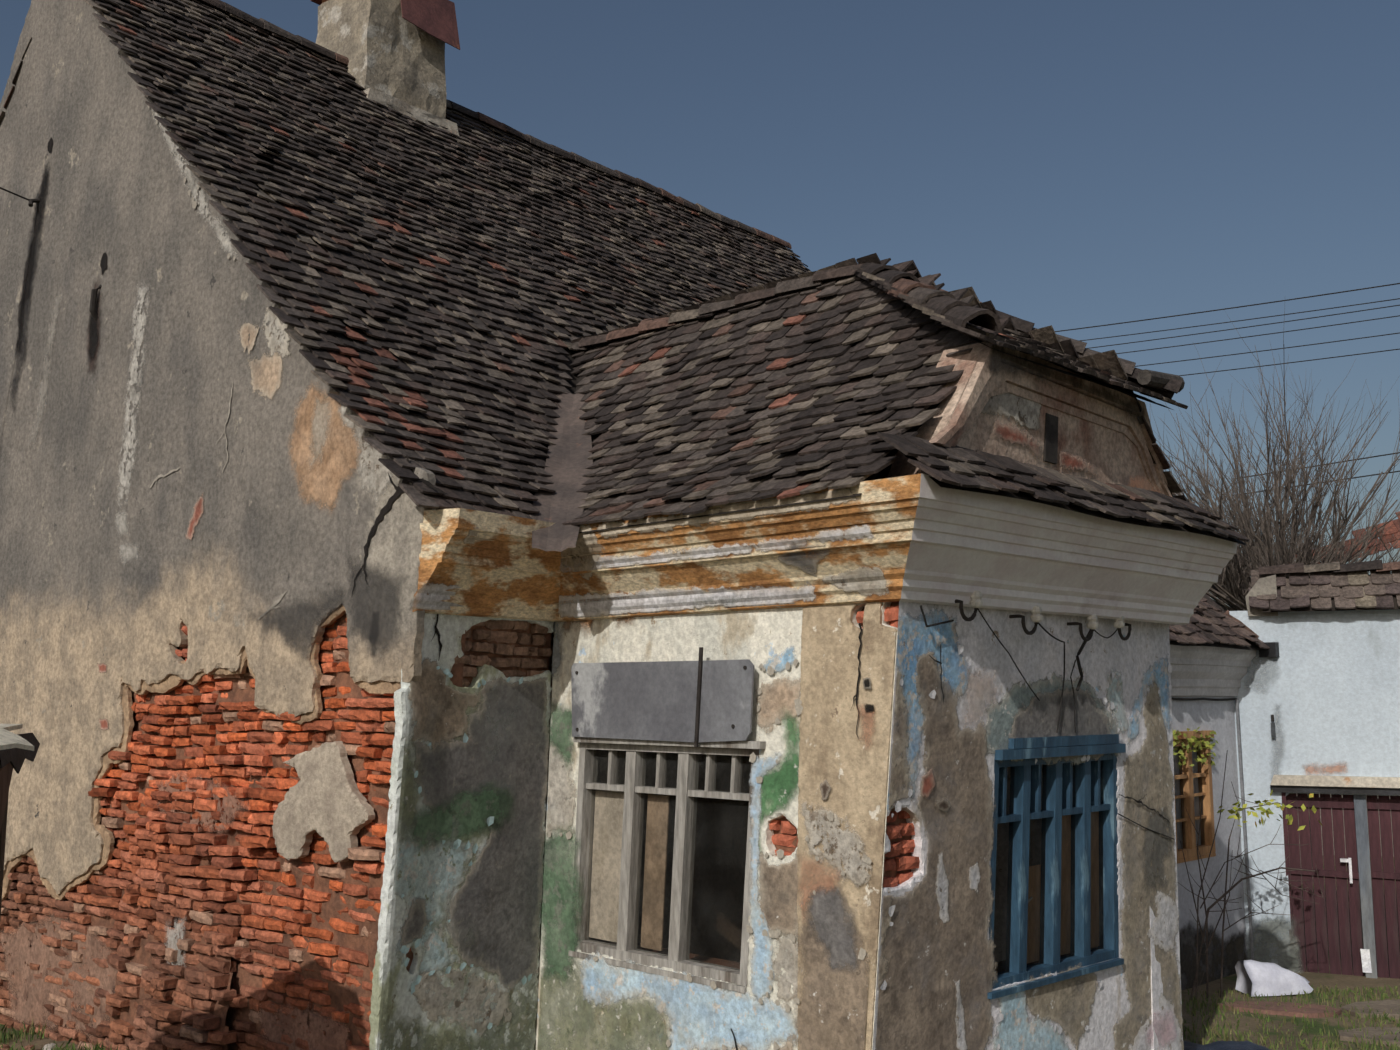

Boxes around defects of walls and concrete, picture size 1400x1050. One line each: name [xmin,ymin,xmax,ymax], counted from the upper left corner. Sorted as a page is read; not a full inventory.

leakage [11,167,48,397]
spalling [239,307,290,400]
spalling [186,494,204,540]
crack [351,455,447,598]
peeling [410,583,462,610]
spalling [0,605,576,1050]
peeling [558,488,1184,1050]